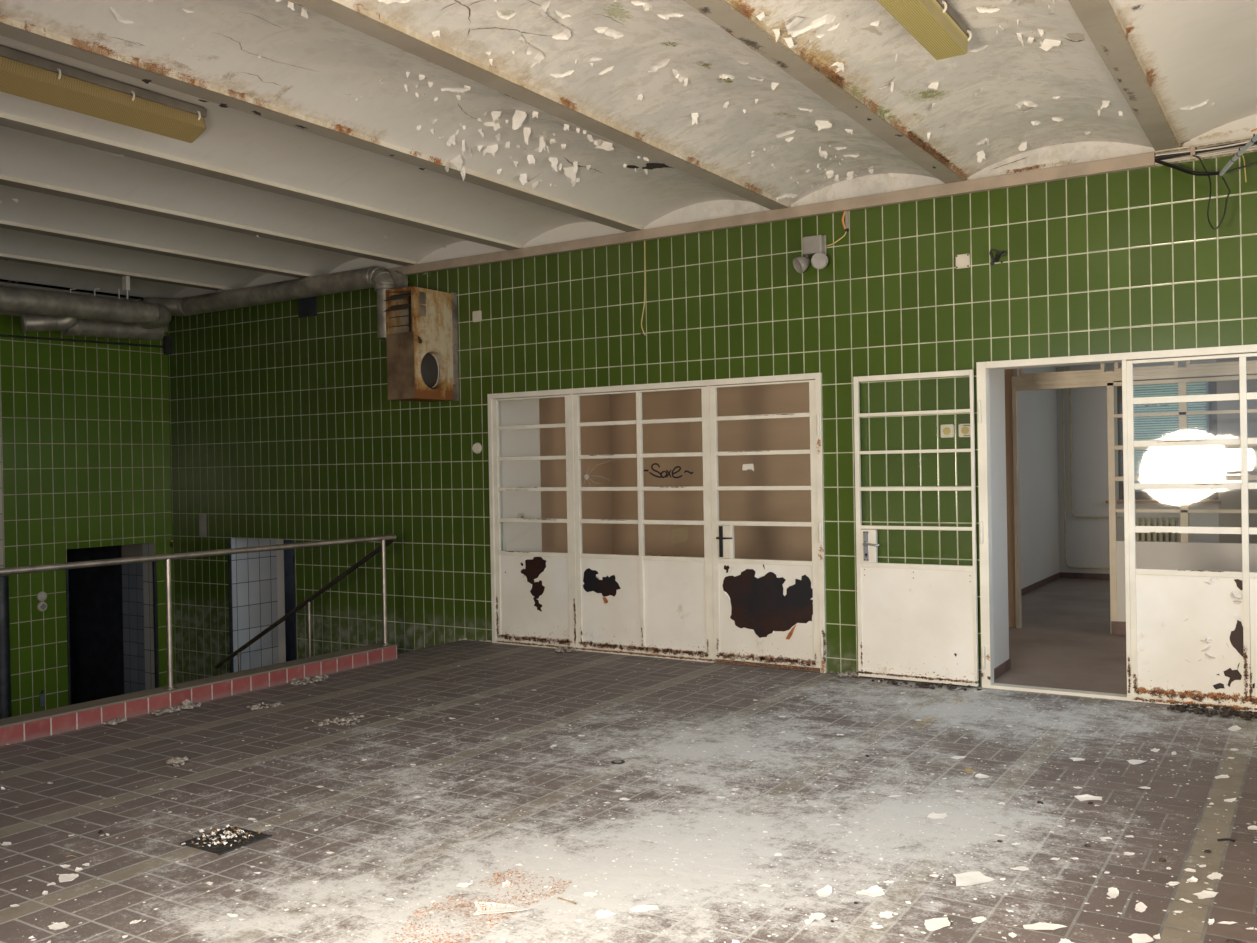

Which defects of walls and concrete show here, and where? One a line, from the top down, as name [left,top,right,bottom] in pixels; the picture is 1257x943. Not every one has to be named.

corrosion [72,39,115,58]
corrosion [128,57,206,89]
crack [442,0,547,36]
peeling [615,0,683,20]
corrosion [730,0,849,89]
peeling [756,0,883,48]
peeling [962,0,1085,51]
peeling [379,72,616,190]
spalling [623,156,672,174]
peeling [748,107,875,201]
corrosion [892,120,968,178]
corrosion [1127,579,1257,711]